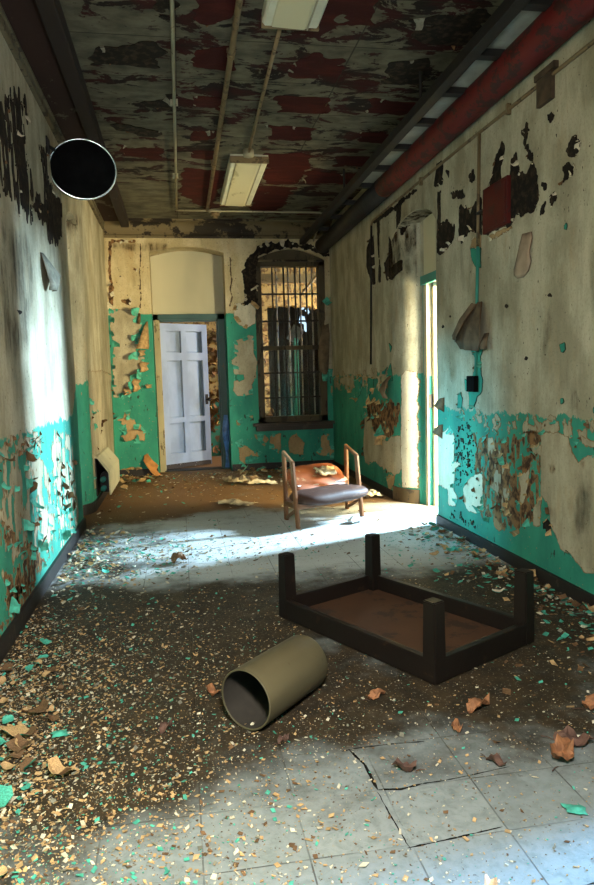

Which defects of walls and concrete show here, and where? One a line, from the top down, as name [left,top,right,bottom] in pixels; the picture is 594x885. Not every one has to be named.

peeling [320,0,379,26]
peeling [0,86,62,292]
peeling [250,153,370,215]
peeling [366,189,417,285]
peeling [434,122,581,255]
peeling [88,239,152,489]
peeling [229,239,330,396]
peeling [316,297,421,490]
peeling [452,301,489,369]
peeling [0,429,134,637]
peeling [433,392,594,574]
crack [341,741,510,849]